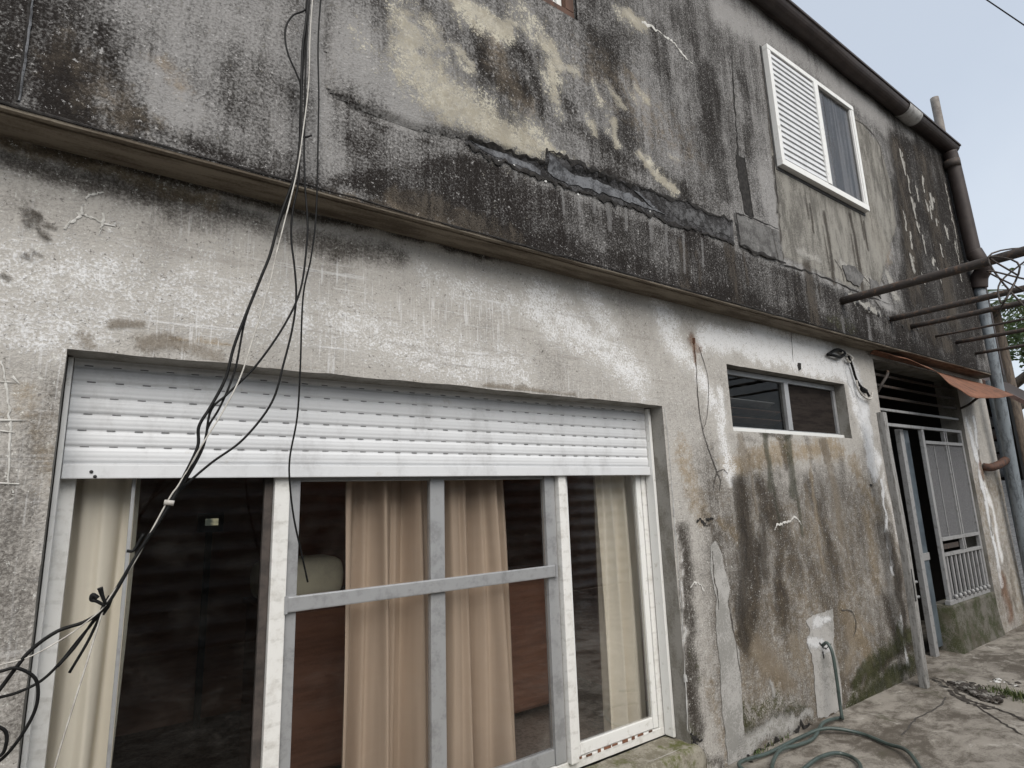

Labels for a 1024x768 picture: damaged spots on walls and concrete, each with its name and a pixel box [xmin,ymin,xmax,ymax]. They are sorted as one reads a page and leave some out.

peeling [609,89,627,149]
crack [0,0,990,373]
flaking render [464,135,735,245]
damp [807,207,836,285]
damp [849,213,869,289]
damp [891,138,962,352]
damp [785,435,803,535]
damp [732,433,781,650]
damp [885,530,906,638]